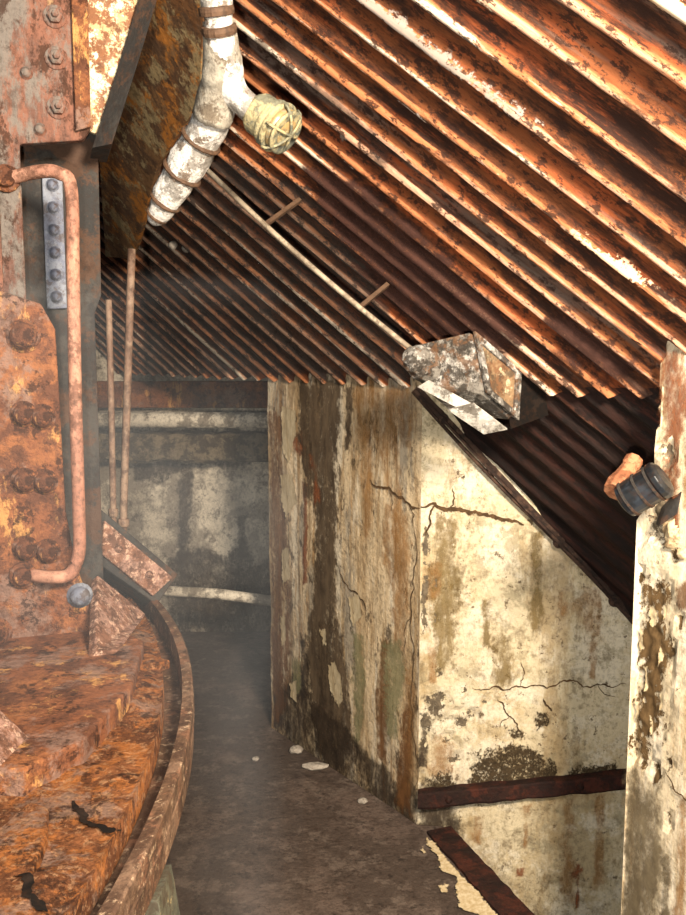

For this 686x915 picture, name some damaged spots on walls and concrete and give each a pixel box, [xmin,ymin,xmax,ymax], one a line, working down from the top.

peeling [650,0,686,25]
corrosion [303,166,524,354]
corrosion [543,304,640,386]
crack [369,479,524,790]
damp [273,379,621,831]
crack [475,664,625,732]
spalling [626,563,683,786]
spalling [646,501,679,562]
spalling [661,444,674,472]
damp [620,768,671,915]